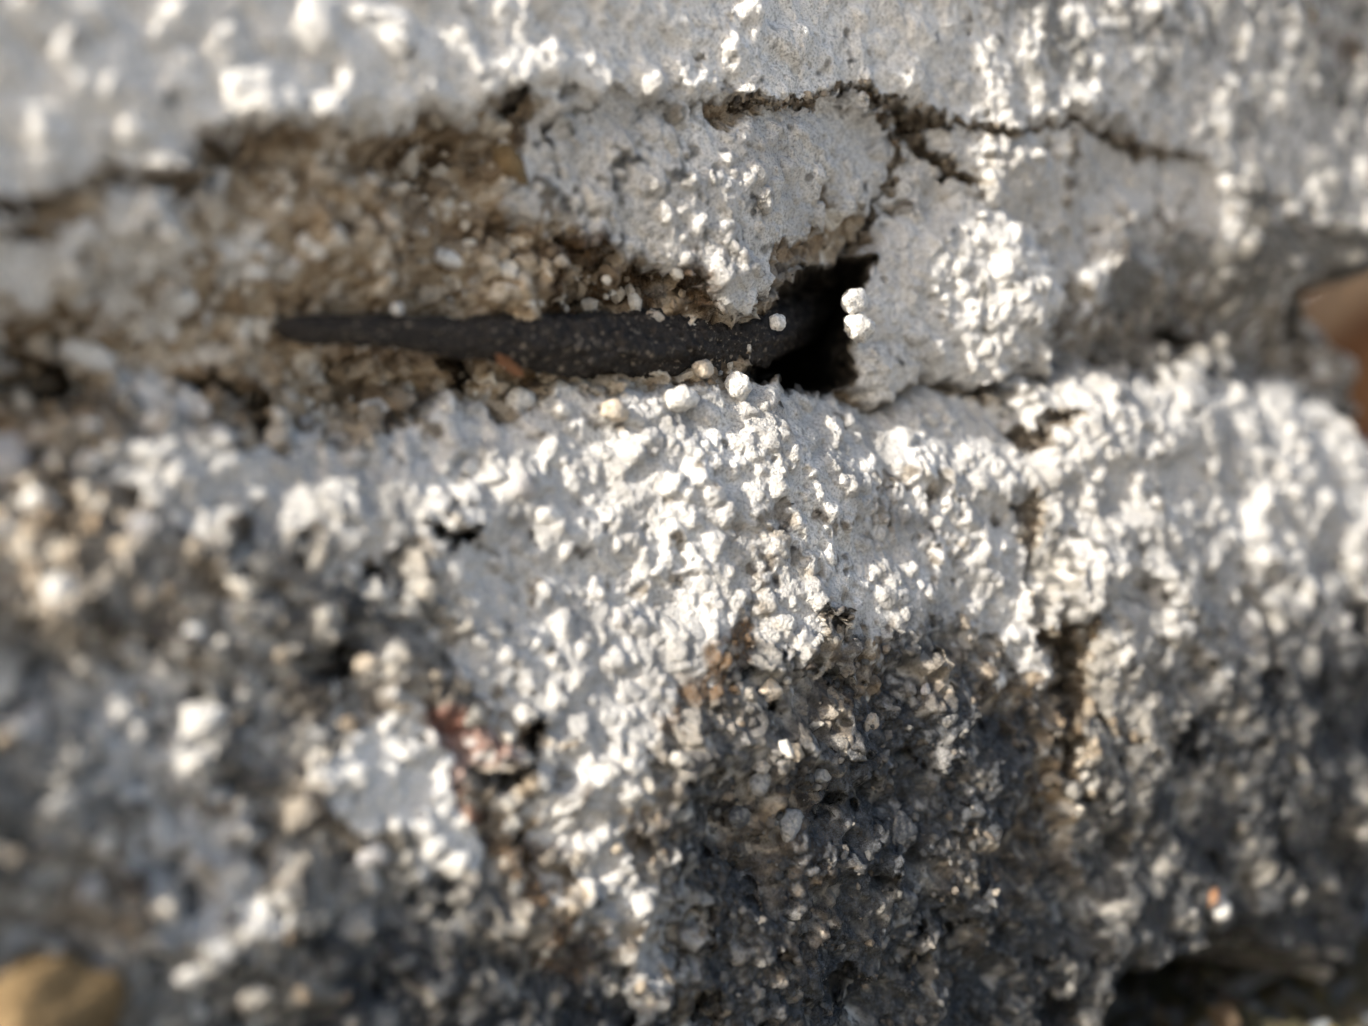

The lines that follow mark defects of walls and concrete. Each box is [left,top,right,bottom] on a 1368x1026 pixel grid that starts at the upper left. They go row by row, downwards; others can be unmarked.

crack [728,78,1206,255]
spalling [0,96,1090,1026]
spalling [1259,656,1294,708]
spalling [1171,718,1206,768]
spalling [1207,887,1231,923]